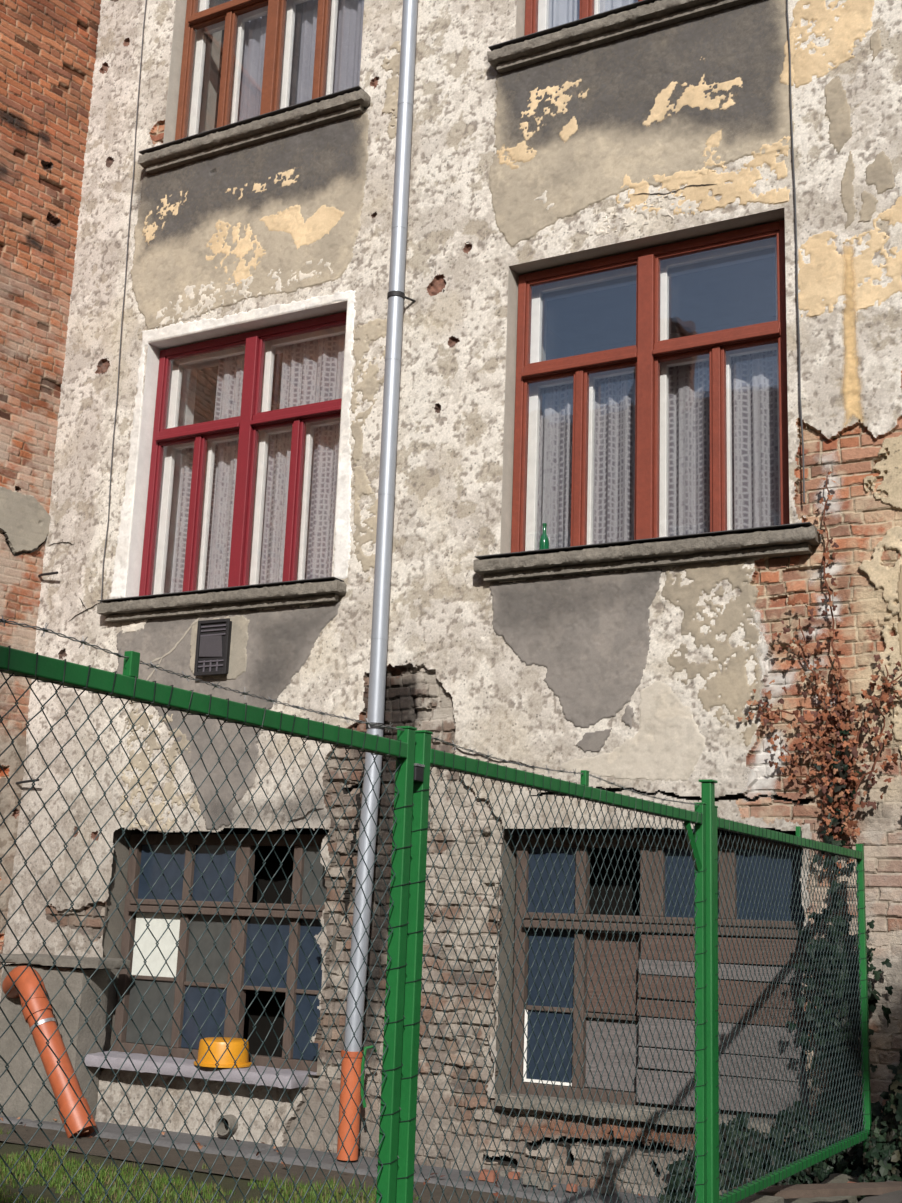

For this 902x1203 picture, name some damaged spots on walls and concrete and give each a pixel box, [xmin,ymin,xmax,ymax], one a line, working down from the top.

peeling [497,79,589,170]
peeling [585,128,791,236]
peeling [643,75,743,127]
peeling [824,76,895,229]
peeling [155,205,344,329]
flaking render [386,663,456,755]
crack [455,747,565,796]
crack [596,786,813,806]
flaking render [736,415,902,1135]
flaking render [282,745,365,1153]
flaking render [414,767,695,1197]
flaking render [358,934,388,1159]